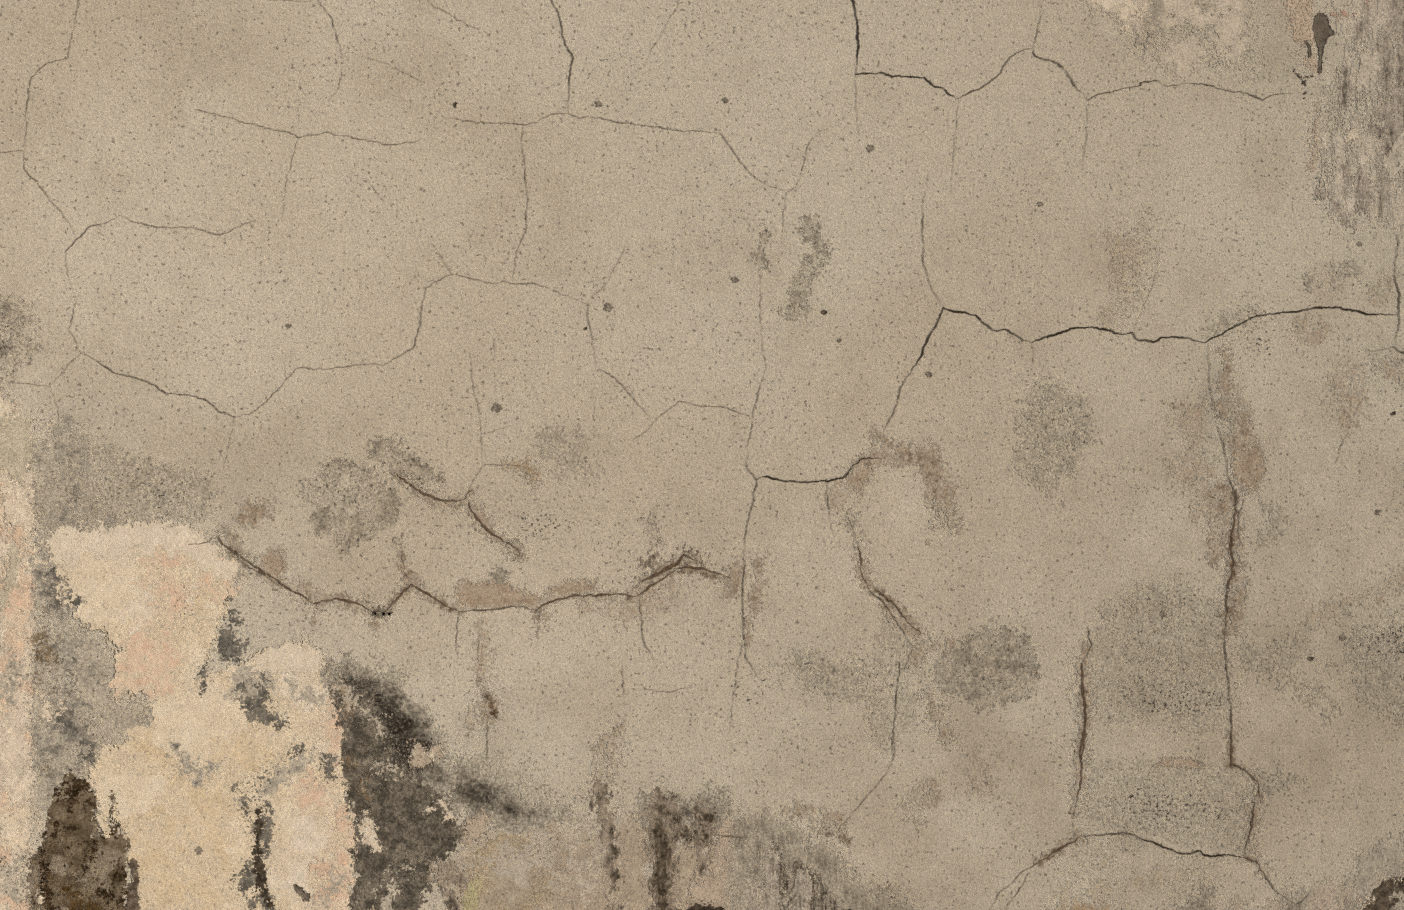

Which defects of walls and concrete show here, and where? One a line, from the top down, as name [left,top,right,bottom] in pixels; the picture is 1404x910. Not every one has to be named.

flaking render [1293,13,1336,99]
flaking render [1293,241,1367,300]
flaking render [297,433,446,559]
crack [0,0,932,832]
crack [852,0,1404,906]
water stain [17,402,207,910]
peeling [0,288,358,910]
water stain [582,720,630,800]
flaking render [1066,574,1404,869]
water stain [721,800,916,910]
flaking render [1229,857,1404,910]